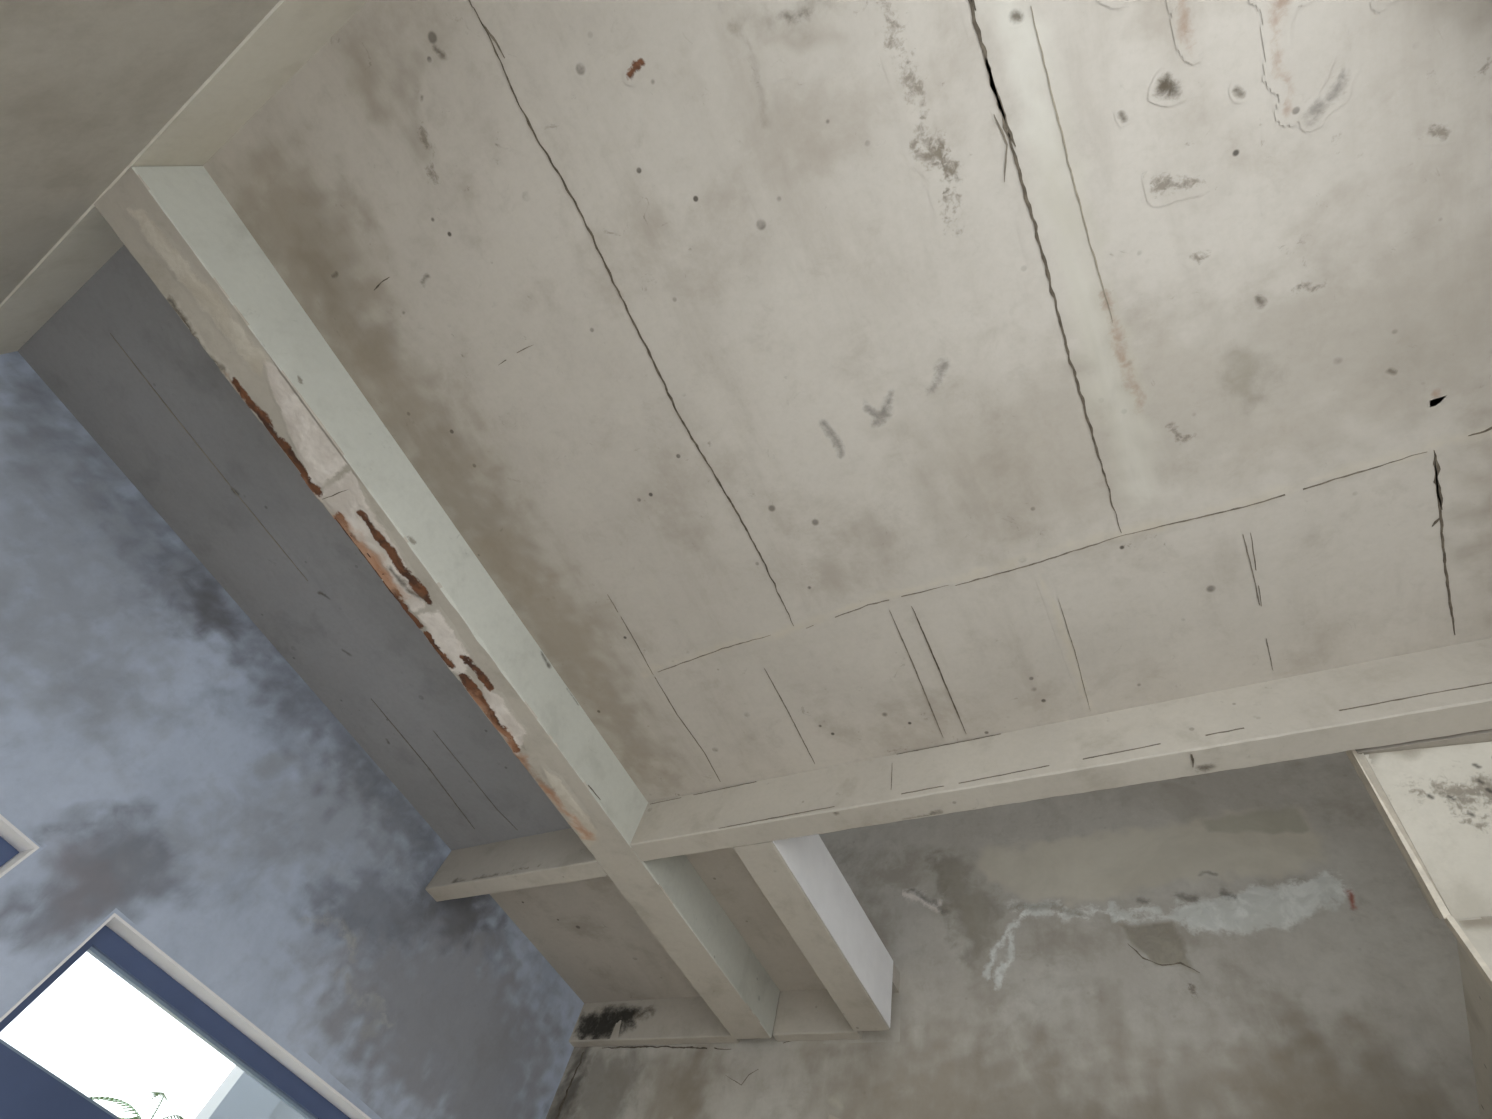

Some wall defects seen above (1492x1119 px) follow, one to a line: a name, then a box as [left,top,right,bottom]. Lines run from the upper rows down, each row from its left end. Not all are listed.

flaking render [122,196,414,570]
corrosion [229,373,602,845]
flaking render [408,600,532,750]
crack [469,0,794,626]
leakage [0,351,1492,1119]
leakage [716,0,974,249]
crack [968,0,1122,533]
leakage [815,0,1492,645]
crack [1432,450,1455,635]